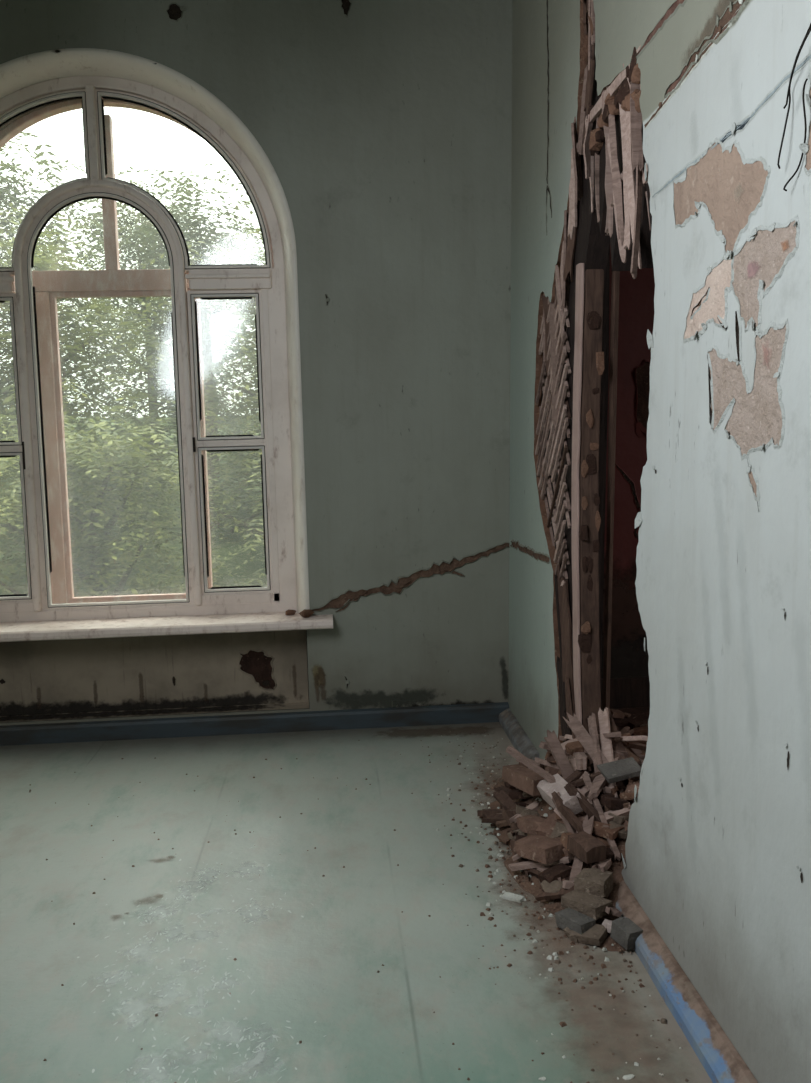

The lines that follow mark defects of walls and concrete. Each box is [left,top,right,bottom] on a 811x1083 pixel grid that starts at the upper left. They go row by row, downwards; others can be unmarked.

flaking render [577,0,595,155]
peeling [644,0,750,130]
peeling [673,137,800,511]
flaking render [633,329,653,438]
crack [311,539,549,613]
water stain [0,692,283,721]
flaking render [237,649,277,690]
water stain [328,690,493,709]